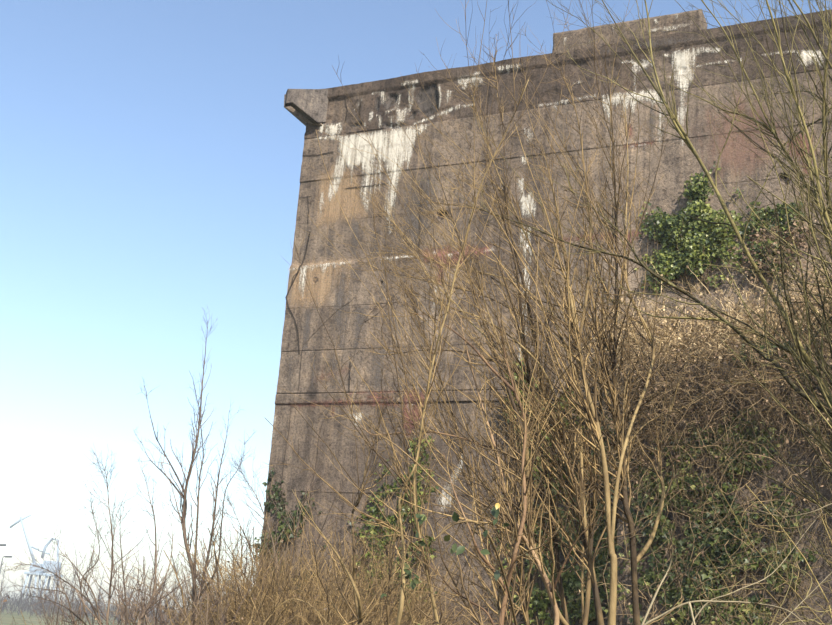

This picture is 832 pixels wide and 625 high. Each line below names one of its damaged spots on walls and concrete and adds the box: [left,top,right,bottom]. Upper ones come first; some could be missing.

damp [458,72,482,89]
damp [636,20,727,123]
damp [593,89,662,139]
damp [319,86,469,232]
damp [518,179,535,214]